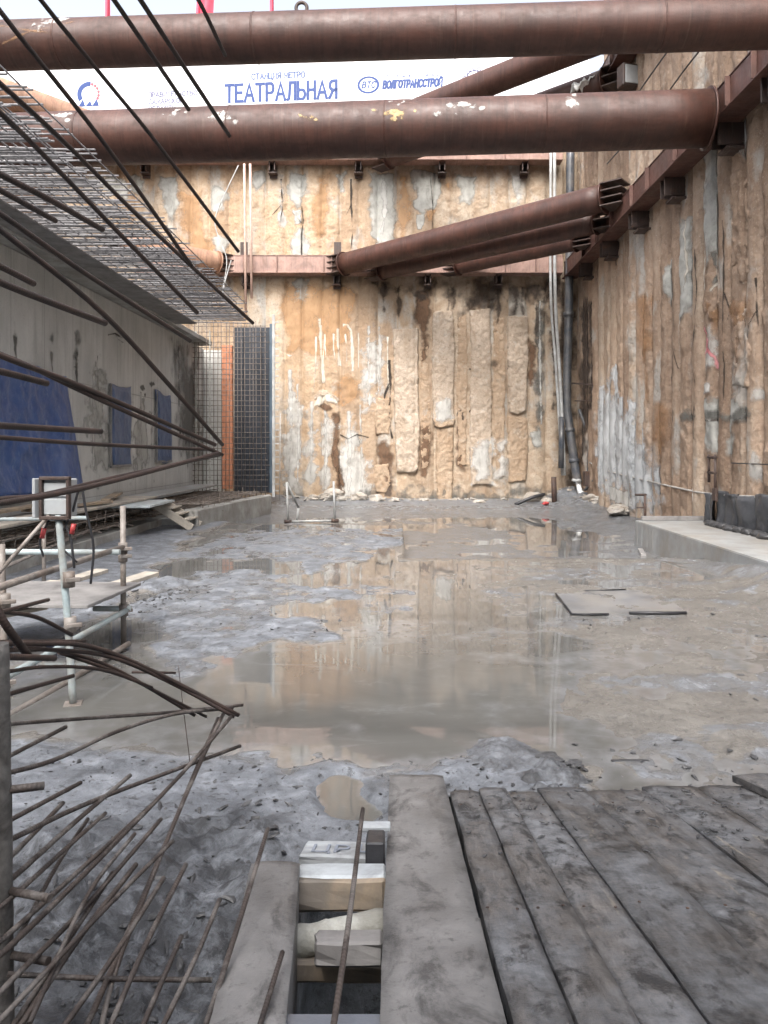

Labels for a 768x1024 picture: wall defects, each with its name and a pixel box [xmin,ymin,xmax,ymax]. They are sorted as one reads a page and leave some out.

peeling [372,99,416,121]